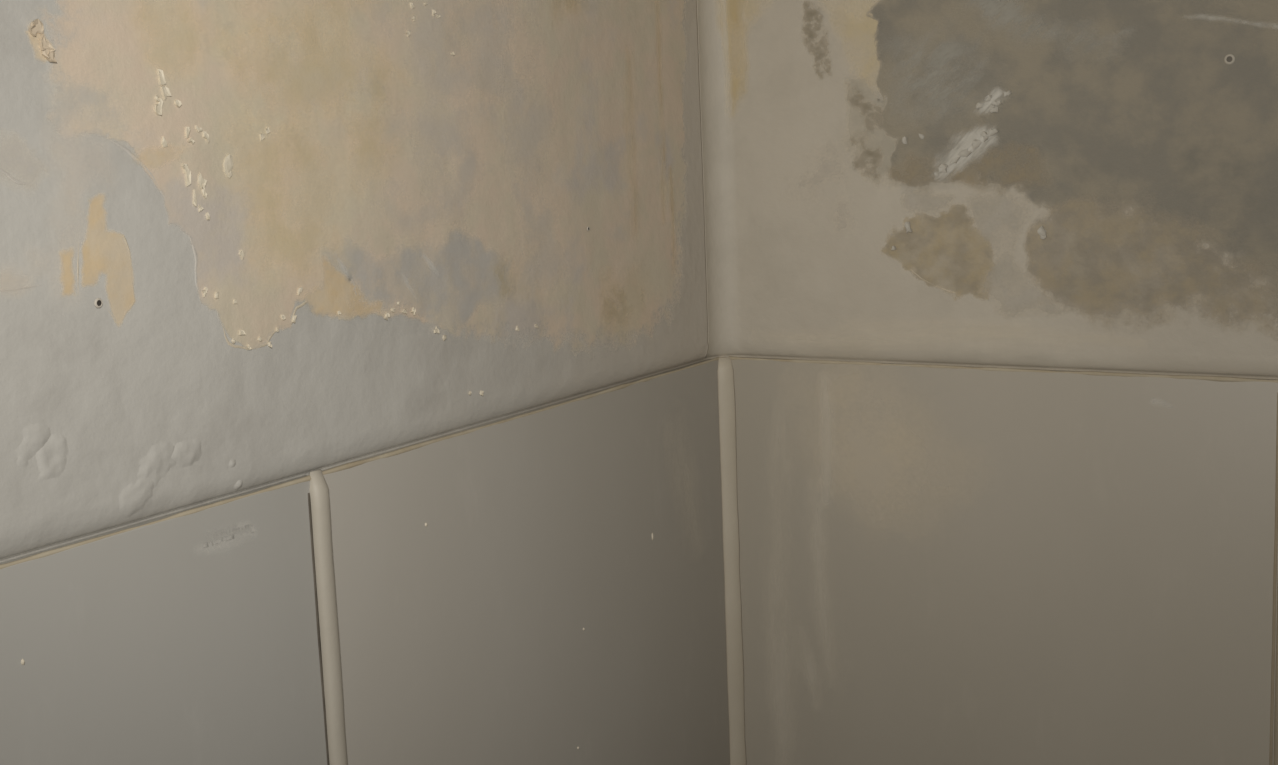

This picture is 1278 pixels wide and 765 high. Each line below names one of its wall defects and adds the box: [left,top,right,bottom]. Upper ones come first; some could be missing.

peeling [27,19,57,63]
peeling [60,195,135,326]